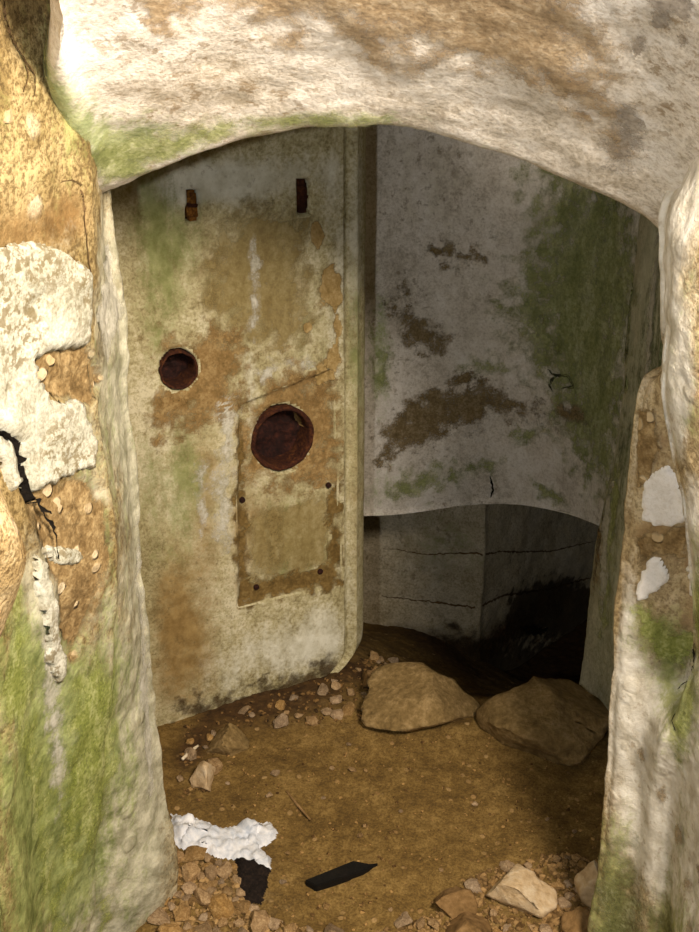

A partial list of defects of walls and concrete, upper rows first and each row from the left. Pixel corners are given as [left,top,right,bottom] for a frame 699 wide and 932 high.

corrosion [151,320,345,609]
damp [442,481,614,672]